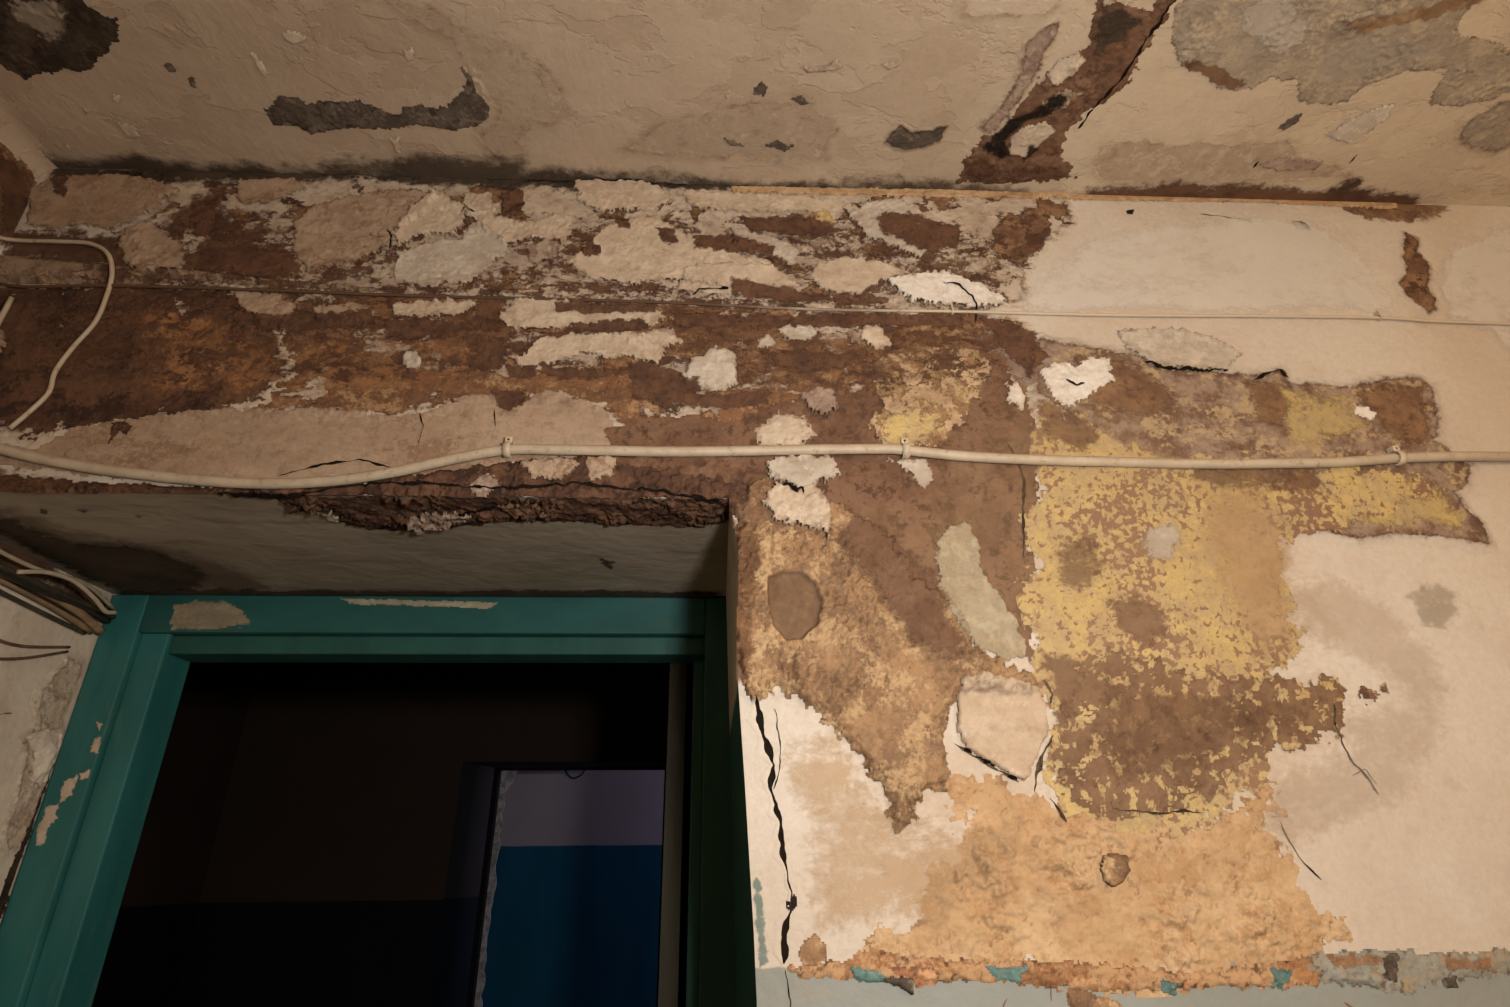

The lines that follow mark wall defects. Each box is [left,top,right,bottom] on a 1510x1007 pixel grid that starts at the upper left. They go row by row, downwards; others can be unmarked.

spalling [0,0,120,80]
spalling [955,0,1510,190]
peeling [25,170,1455,459]
flaking render [0,454,1510,1007]
crack [747,697,797,1007]
crack [955,679,1067,822]